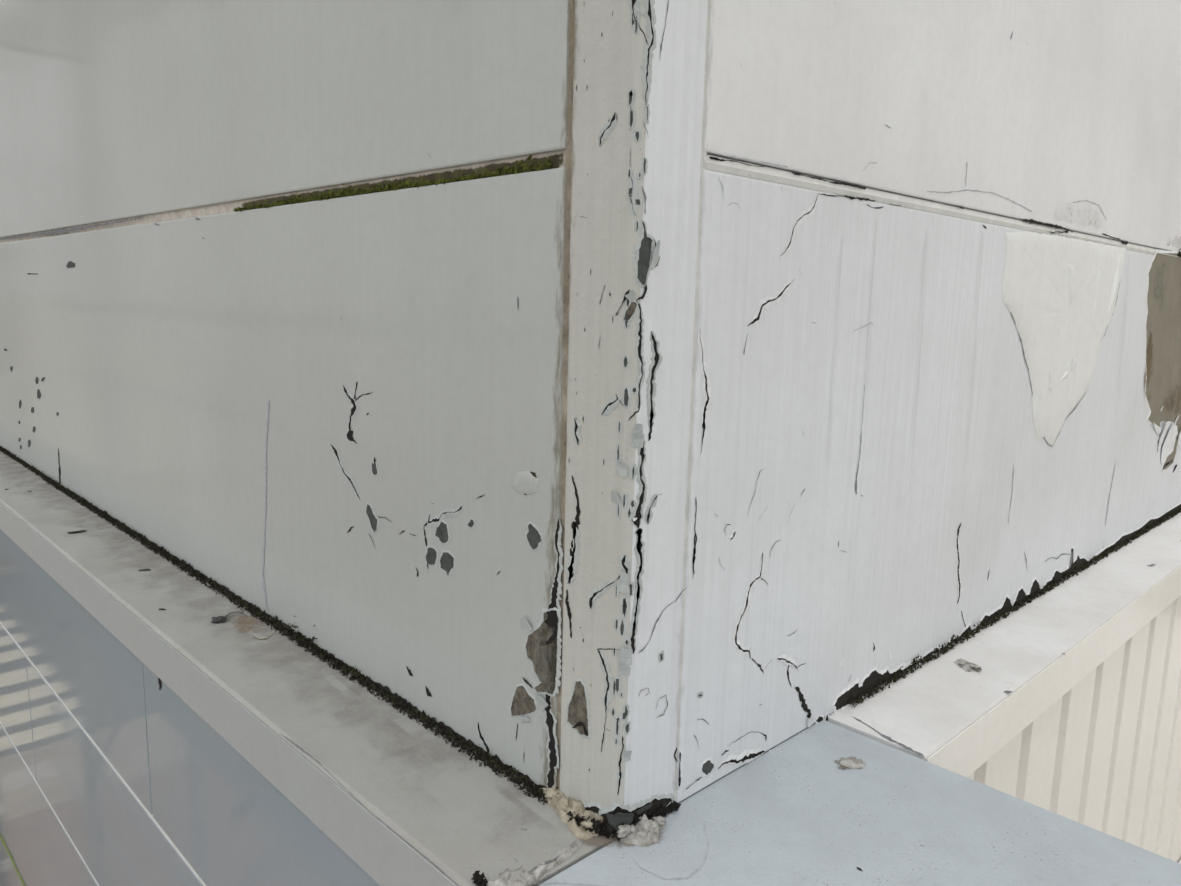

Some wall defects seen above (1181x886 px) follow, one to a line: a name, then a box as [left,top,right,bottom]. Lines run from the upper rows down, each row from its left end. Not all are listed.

crack [598,0,669,146]
peeling [627,87,650,144]
crack [744,194,818,352]
peeling [1144,249,1181,473]
crack [331,382,373,533]
peeling [424,519,456,578]
peeling [525,521,544,552]
crack [544,300,811,794]
crack [955,524,990,627]
crack [476,691,559,788]
peeling [509,607,591,739]
peeling [610,570,634,778]